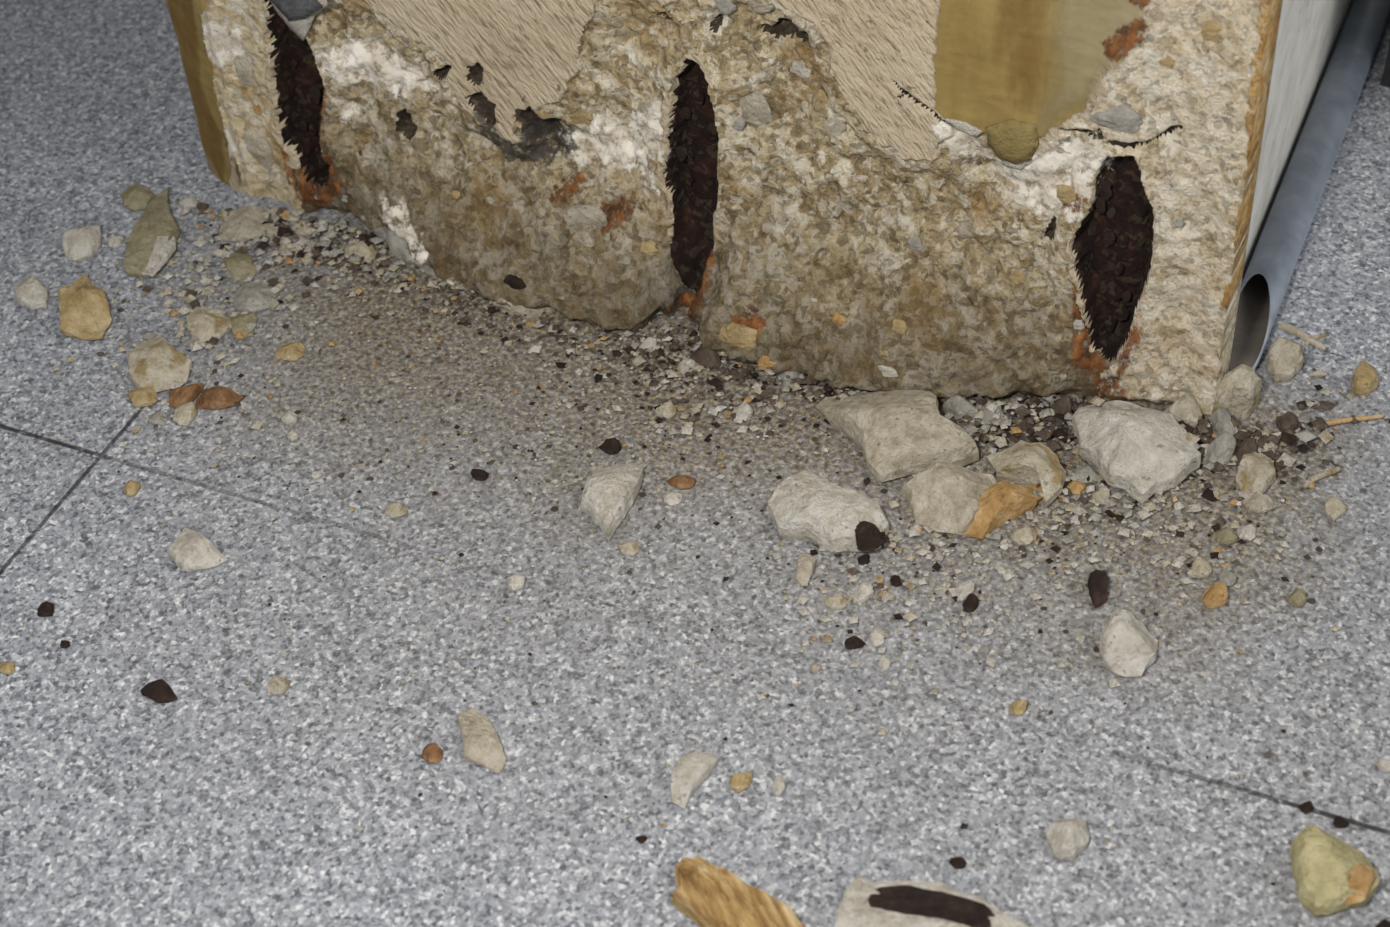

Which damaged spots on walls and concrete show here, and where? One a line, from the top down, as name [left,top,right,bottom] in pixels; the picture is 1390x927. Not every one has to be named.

flaking render [127,336,193,407]
flaking render [186,306,258,343]
rust [264,0,340,207]
rust [663,59,719,321]
spalling [201,0,1262,441]
crack [893,80,953,127]
damp [932,0,1144,223]
rust [1063,156,1154,402]
crack [1063,125,1183,149]
rust [1102,0,1149,61]